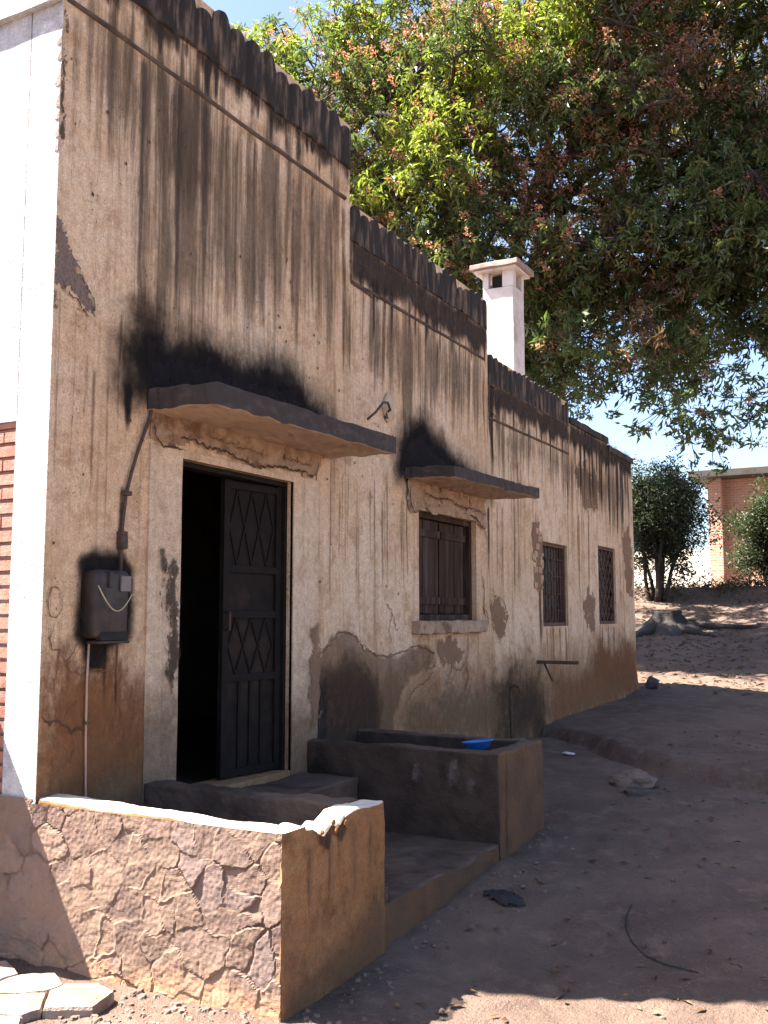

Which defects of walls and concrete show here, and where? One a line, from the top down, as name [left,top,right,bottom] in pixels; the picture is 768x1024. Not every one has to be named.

flaking render [53,215,96,316]
water stain [102,0,631,584]
spalling [150,411,328,480]
spalling [407,479,487,535]
flaking render [531,522,544,592]
flaking render [490,591,509,643]
flaking render [583,586,596,632]
water stain [317,662,380,742]
water stain [317,630,437,720]
spalling [315,813,348,850]